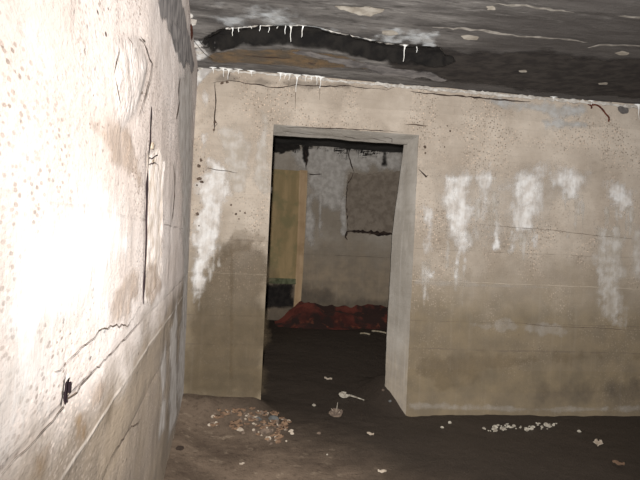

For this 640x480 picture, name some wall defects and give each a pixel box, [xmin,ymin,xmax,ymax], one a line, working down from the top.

crack [213,73,394,131]
spalling [202,25,455,68]
crack [1,37,175,474]
crack [286,124,425,239]
water stain [158,0,640,437]